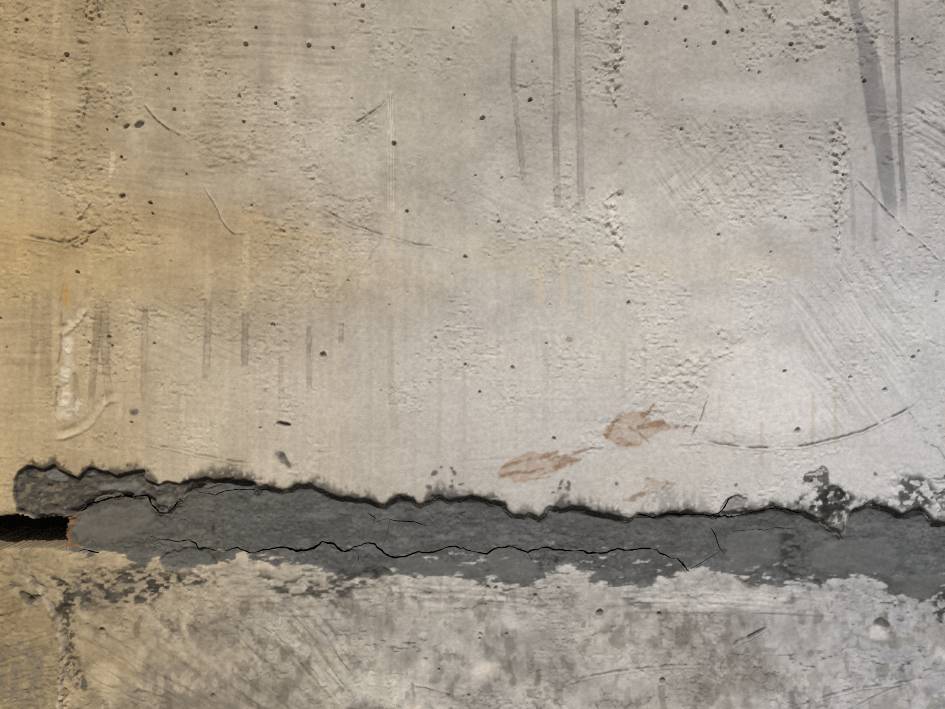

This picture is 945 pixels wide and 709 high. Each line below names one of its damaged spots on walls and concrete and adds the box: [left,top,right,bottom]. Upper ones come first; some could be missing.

damp [509,34,528,200]
damp [550,0,562,216]
damp [573,5,587,219]
damp [848,0,908,260]
rust [497,403,695,484]
spalling [12,465,252,519]
crack [81,487,270,513]
crack [151,496,801,572]
rust [621,476,676,504]
spalling [718,493,749,517]
spalling [801,464,848,538]
spalling [929,488,945,529]